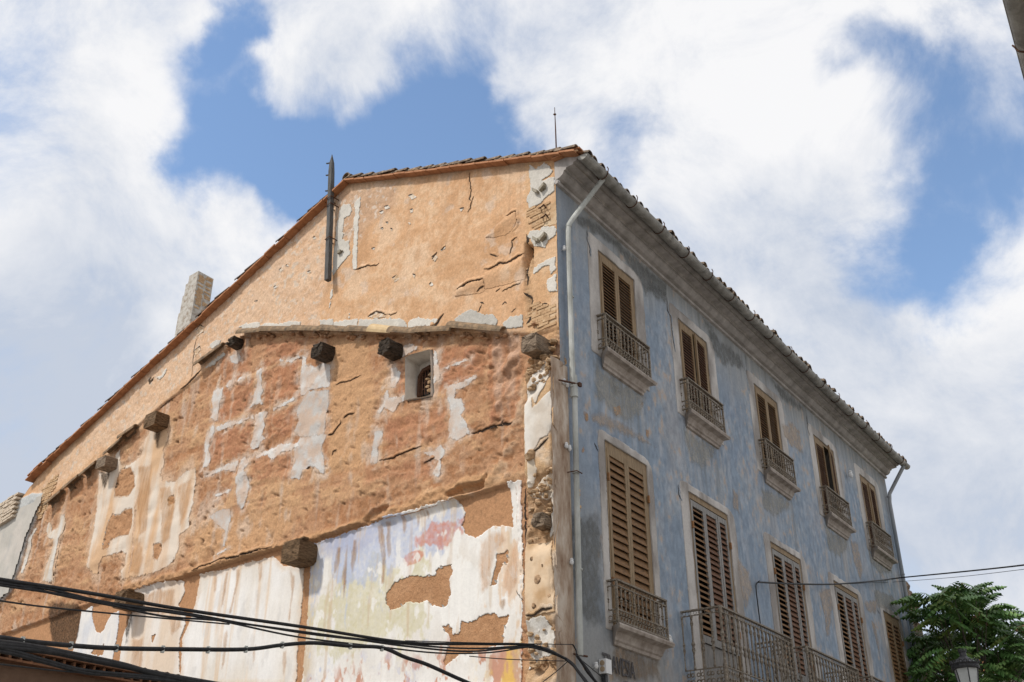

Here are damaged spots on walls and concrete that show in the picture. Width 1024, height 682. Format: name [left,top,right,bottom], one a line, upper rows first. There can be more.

crack [466,173,474,212]
flaking render [526,201,557,229]
crack [456,208,547,324]
crack [336,374,361,385]
crack [328,410,355,455]
crack [471,417,514,434]
crack [379,444,435,463]
flaking render [102,509,132,550]
flaking render [385,565,453,610]
flaking render [492,550,509,585]
flaking render [443,613,509,666]
spalling [526,603,556,670]